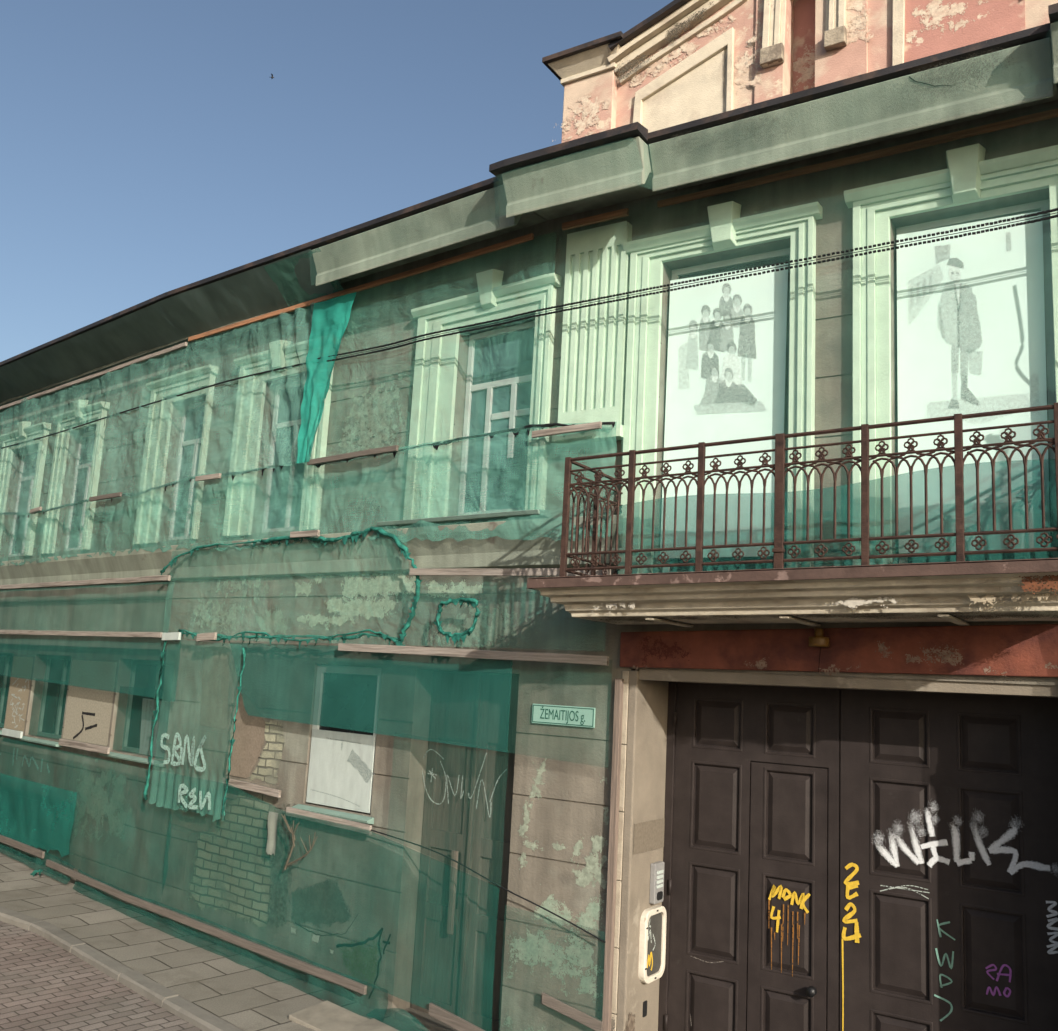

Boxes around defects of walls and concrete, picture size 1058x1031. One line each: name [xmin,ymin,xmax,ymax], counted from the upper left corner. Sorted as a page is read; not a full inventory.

peeling [189,573,530,650]
peeling [518,758,610,889]